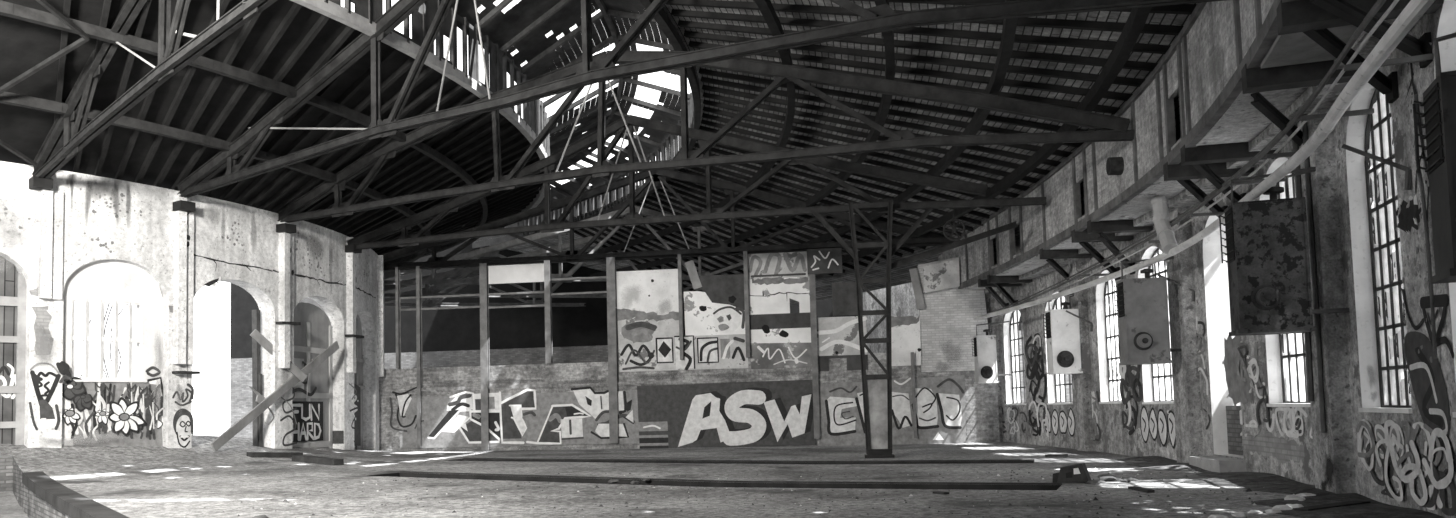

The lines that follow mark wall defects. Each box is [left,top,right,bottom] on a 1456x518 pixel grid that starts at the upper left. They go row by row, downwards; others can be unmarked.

crack [194,254,376,300]